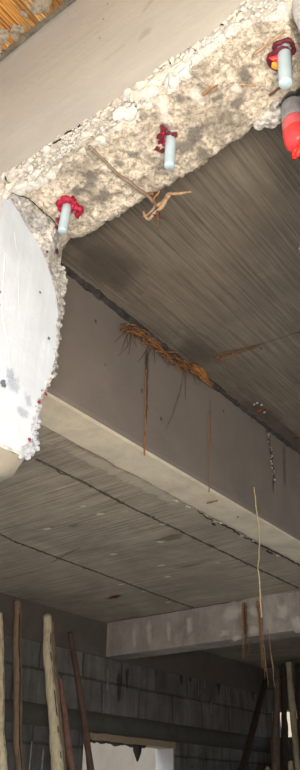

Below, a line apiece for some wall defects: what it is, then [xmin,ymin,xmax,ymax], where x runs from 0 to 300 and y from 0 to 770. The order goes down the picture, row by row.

spalling [0,0,300,460]
crack [0,534,242,622]
crack [34,458,300,593]